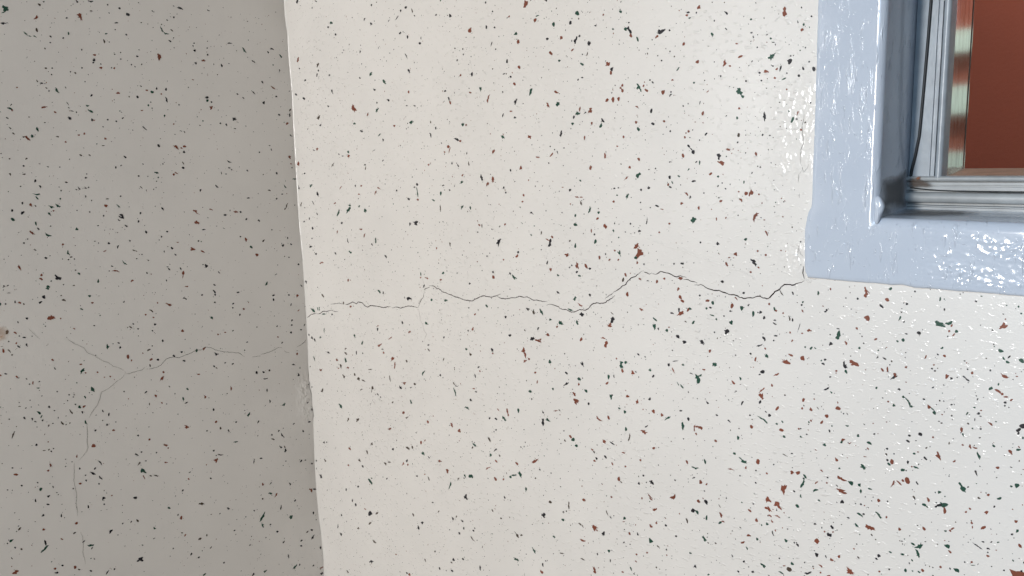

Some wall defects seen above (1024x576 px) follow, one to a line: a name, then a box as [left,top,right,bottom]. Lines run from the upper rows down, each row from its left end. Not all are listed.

crack [71,267,804,458]